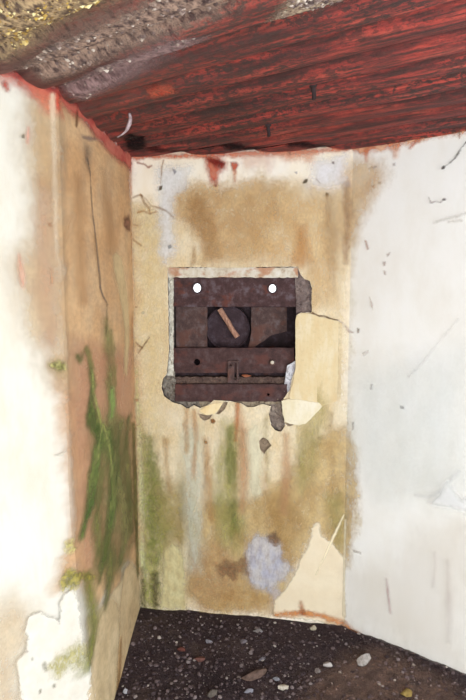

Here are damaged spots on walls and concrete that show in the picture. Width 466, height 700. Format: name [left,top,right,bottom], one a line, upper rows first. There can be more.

rust [0,71,424,186]
crack [87,159,107,303]
water stain [19,95,377,612]
peeling [240,361,322,431]
peeling [16,563,140,700]
peeling [218,515,346,626]